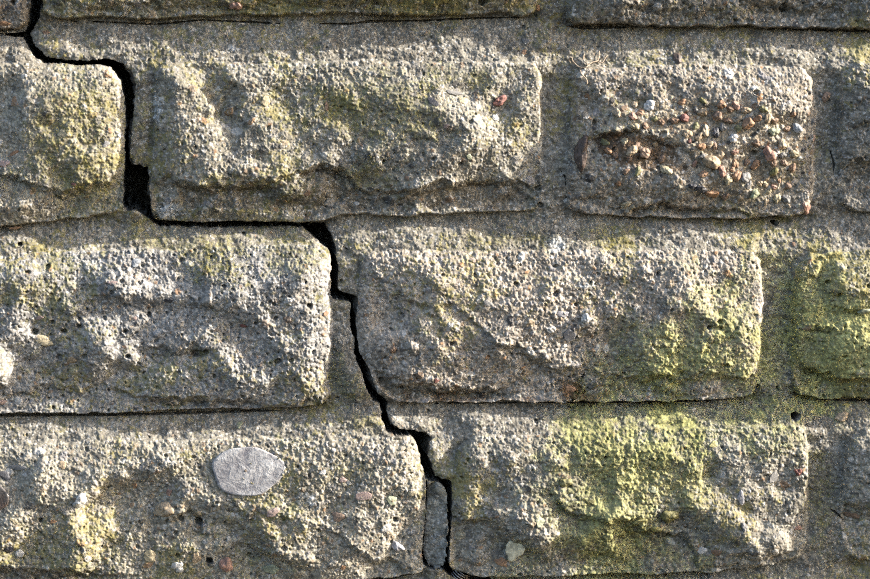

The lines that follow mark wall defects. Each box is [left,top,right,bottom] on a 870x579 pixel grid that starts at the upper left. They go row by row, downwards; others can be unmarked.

crack [0,0,519,579]
crack [435,397,730,405]